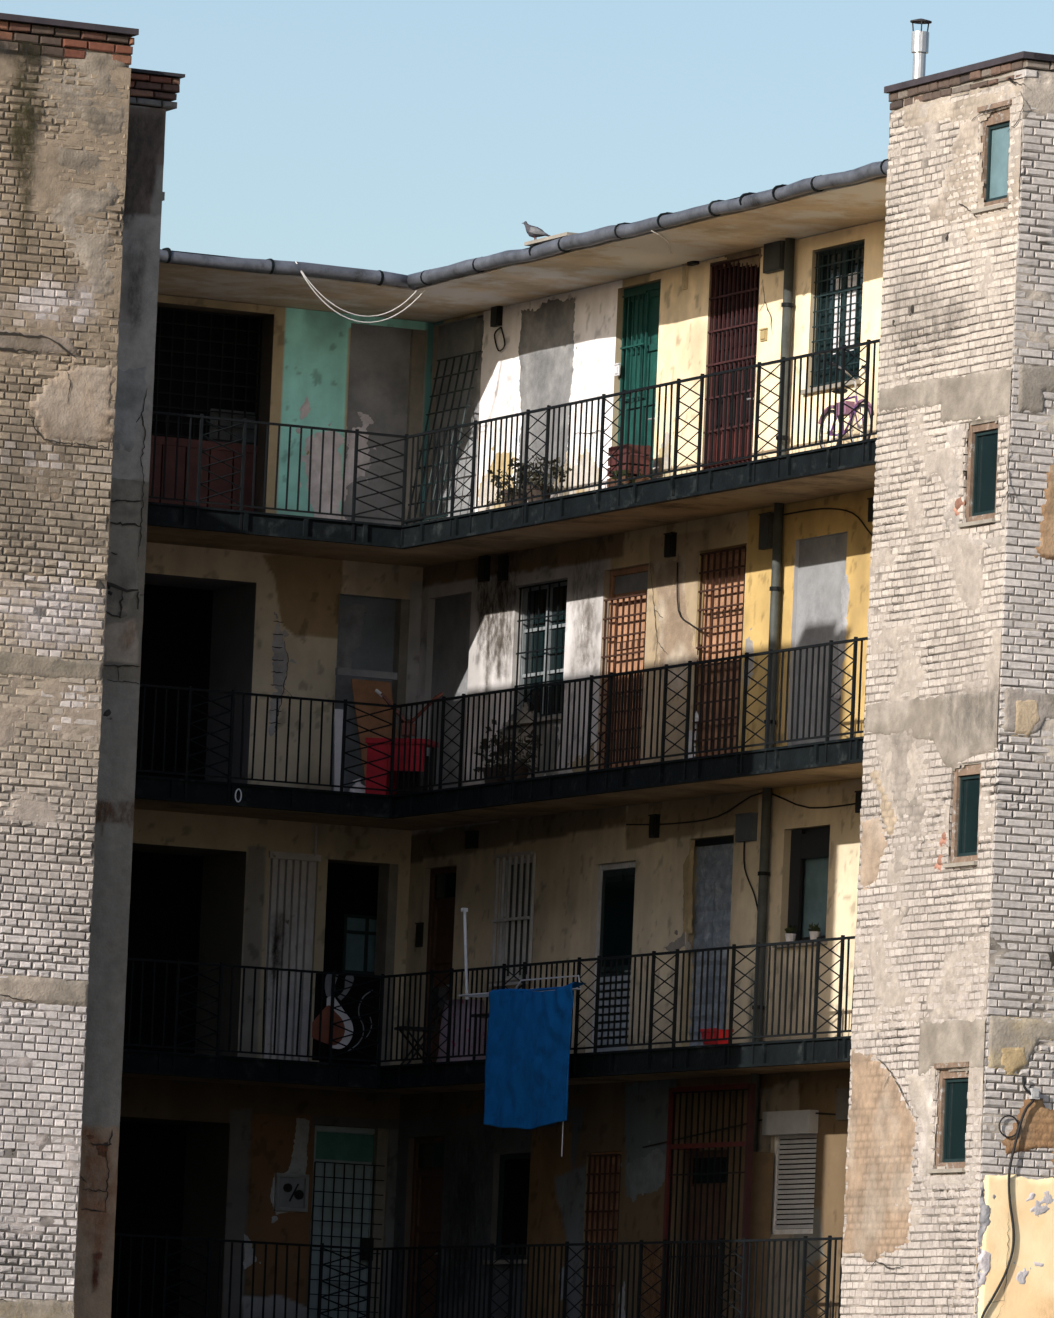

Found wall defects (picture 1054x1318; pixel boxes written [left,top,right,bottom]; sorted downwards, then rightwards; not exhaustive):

leakage [0,41,41,207]
crack [0,332,75,402]
crack [29,414,108,448]
crack [105,390,147,618]
flaking render [1033,454,1054,560]
peeling [270,1118,310,1223]
flaking render [842,1048,996,1287]
flaking render [1002,1098,1054,1217]
peeling [1013,1261,1044,1284]